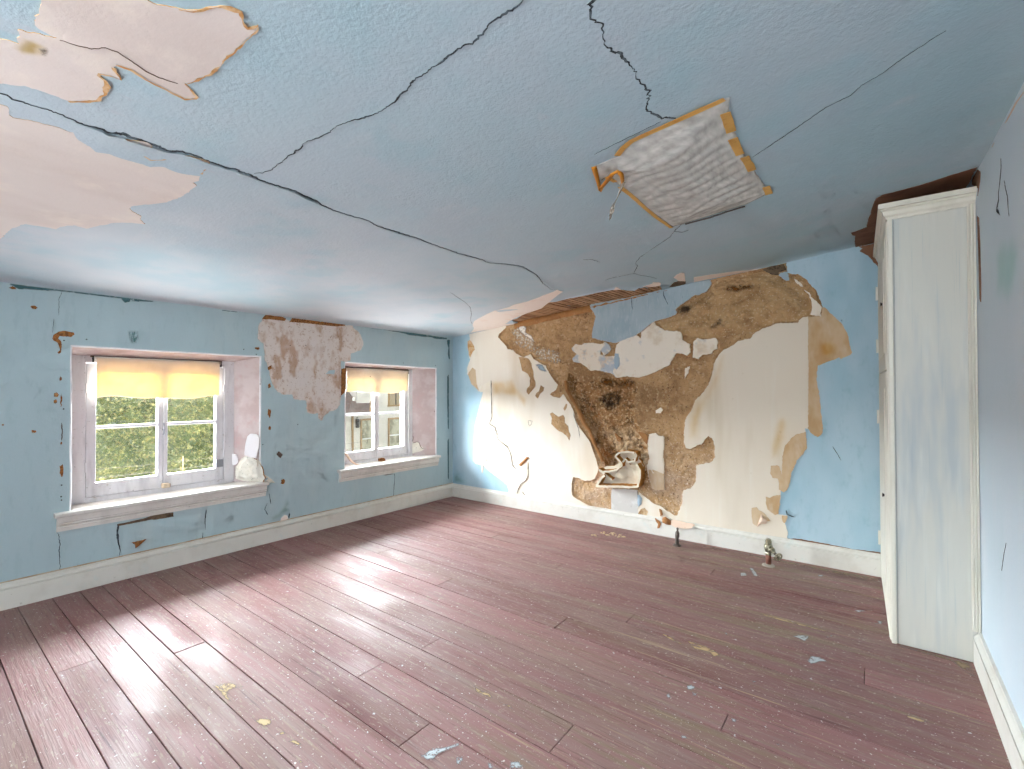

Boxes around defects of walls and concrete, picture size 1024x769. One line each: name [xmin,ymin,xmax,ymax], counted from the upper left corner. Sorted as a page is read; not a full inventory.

peeling [0,104,210,238]
peeling [0,0,259,103]
crack [0,0,556,296]
crack [587,0,676,120]
crack [753,31,945,157]
flaking render [972,170,981,196]
flaking render [255,315,363,421]
flaking render [471,263,823,528]